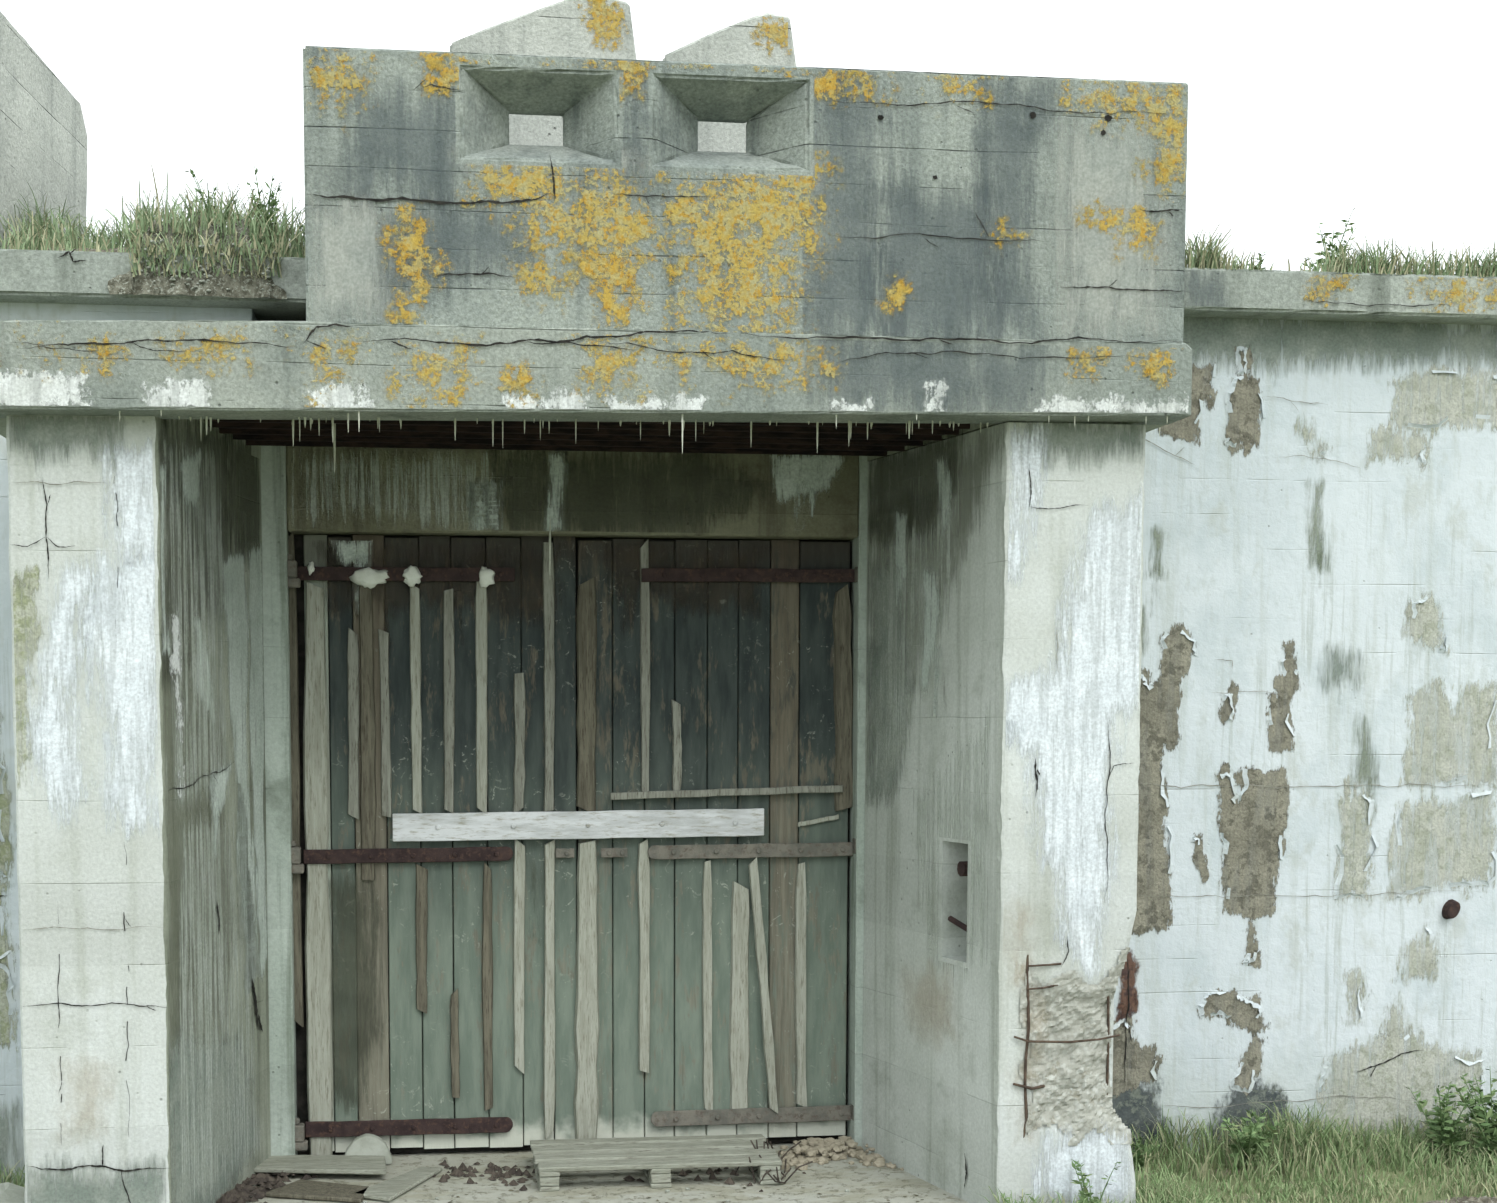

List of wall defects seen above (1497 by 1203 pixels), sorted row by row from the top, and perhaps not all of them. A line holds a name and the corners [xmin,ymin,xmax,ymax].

crack [308,158,556,204]
crack [826,214,1039,247]
crack [15,323,1189,363]
peeling [1158,346,1266,457]
peeling [1367,364,1497,466]
peeling [1332,678,1497,903]
peeling [0,760,18,1049]
spalling [1013,622,1300,1146]
rust [1116,952,1139,1022]
crack [23,915,167,1203]